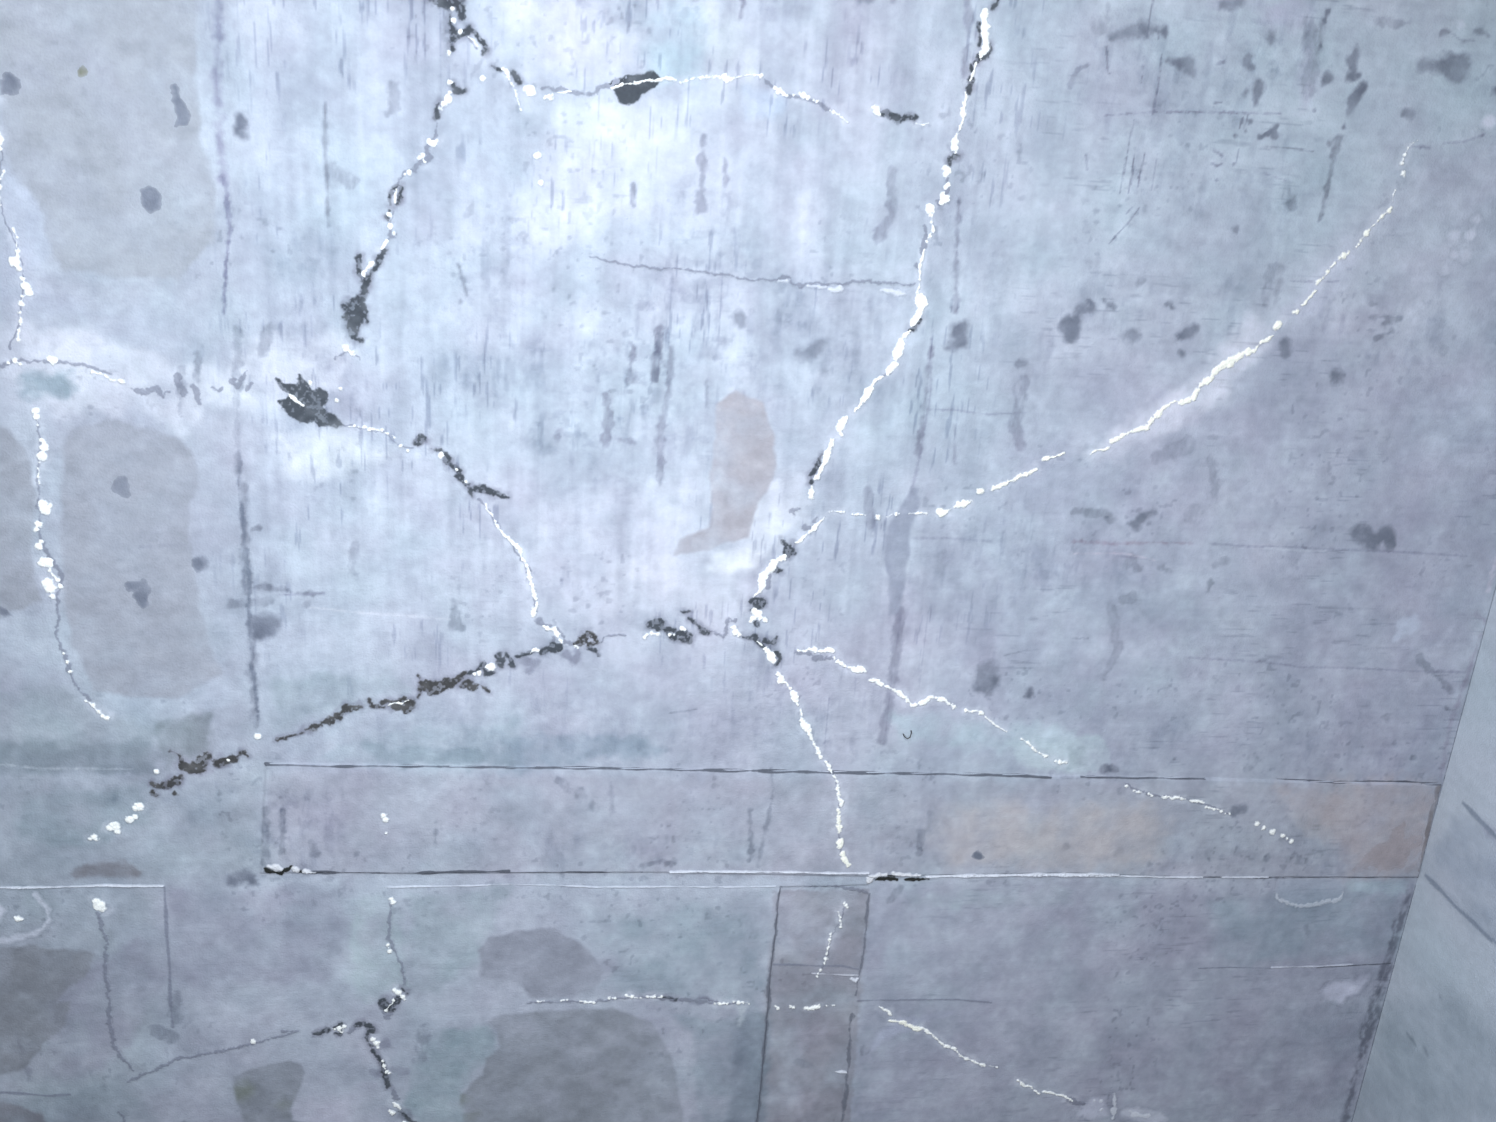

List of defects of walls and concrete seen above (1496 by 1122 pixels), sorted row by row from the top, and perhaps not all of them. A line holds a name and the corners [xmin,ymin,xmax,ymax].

crack [0,131,255,406]
crack [30,407,111,721]
damp [672,387,779,557]
crack [87,0,1419,868]
crack [91,896,418,1122]
crack [526,901,849,1011]
crack [878,1005,1086,1106]